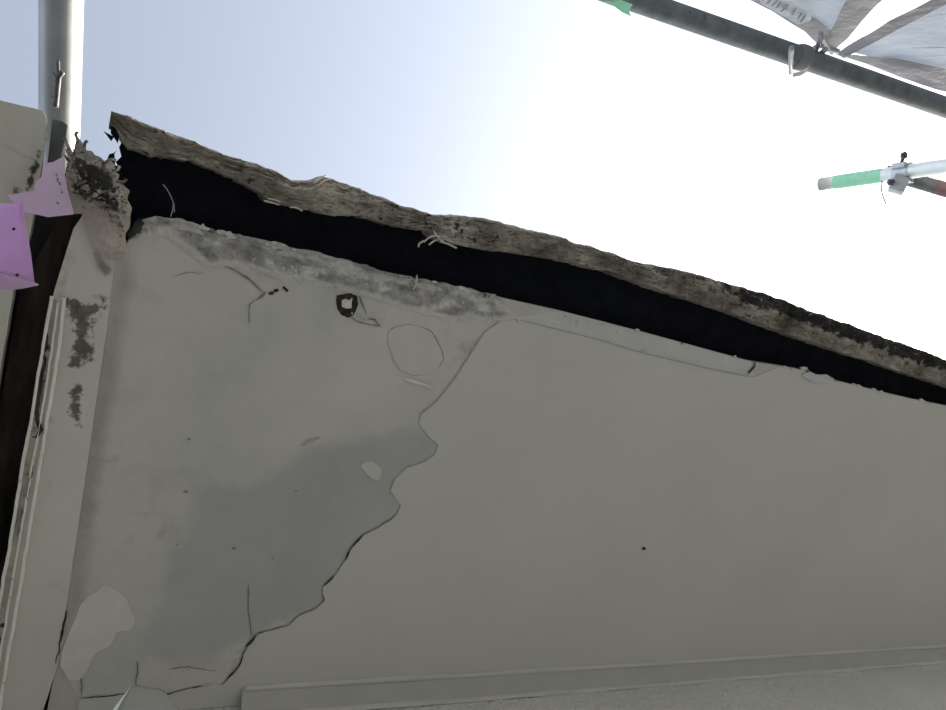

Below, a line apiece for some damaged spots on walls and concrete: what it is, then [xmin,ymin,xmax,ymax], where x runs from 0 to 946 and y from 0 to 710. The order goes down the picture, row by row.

peeling [32,334,49,438]
water stain [57,292,110,432]
peeling [58,131,756,699]
spalling [782,365,835,384]